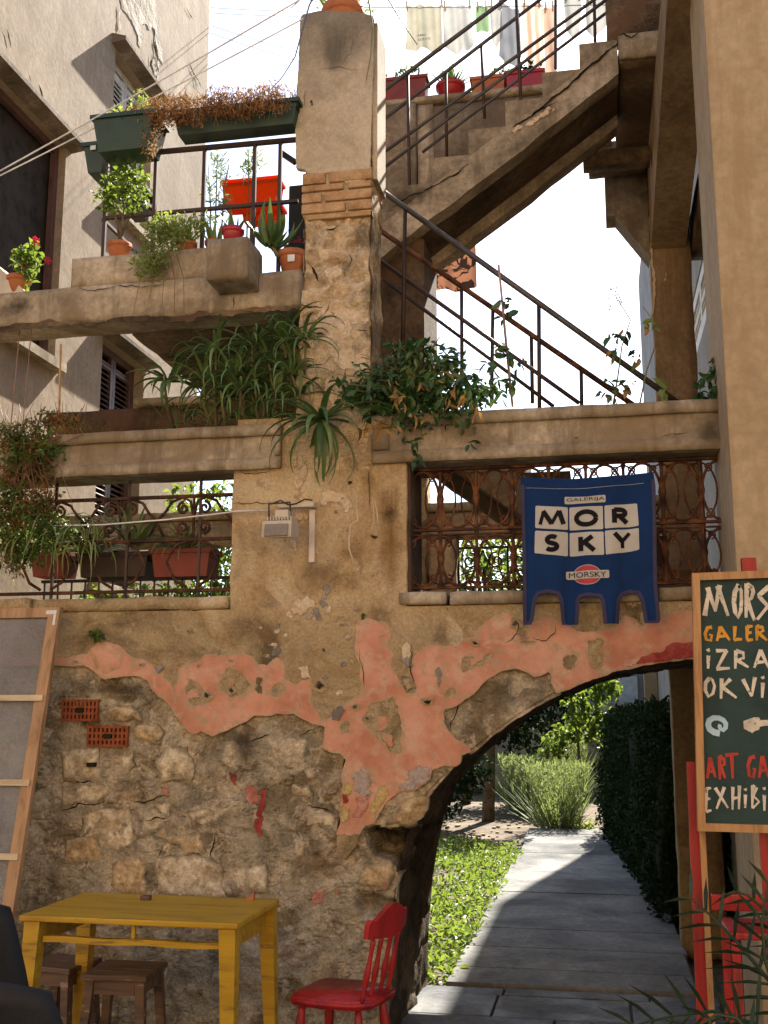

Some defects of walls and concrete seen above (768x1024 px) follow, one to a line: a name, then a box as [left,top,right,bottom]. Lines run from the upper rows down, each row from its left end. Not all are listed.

flaking render [512,107,555,134]
crack [513,32,639,127]
crack [393,164,468,207]
flaking render [0,656,41,779]
flaking render [0,799,15,905]
flaking render [15,584,693,1024]